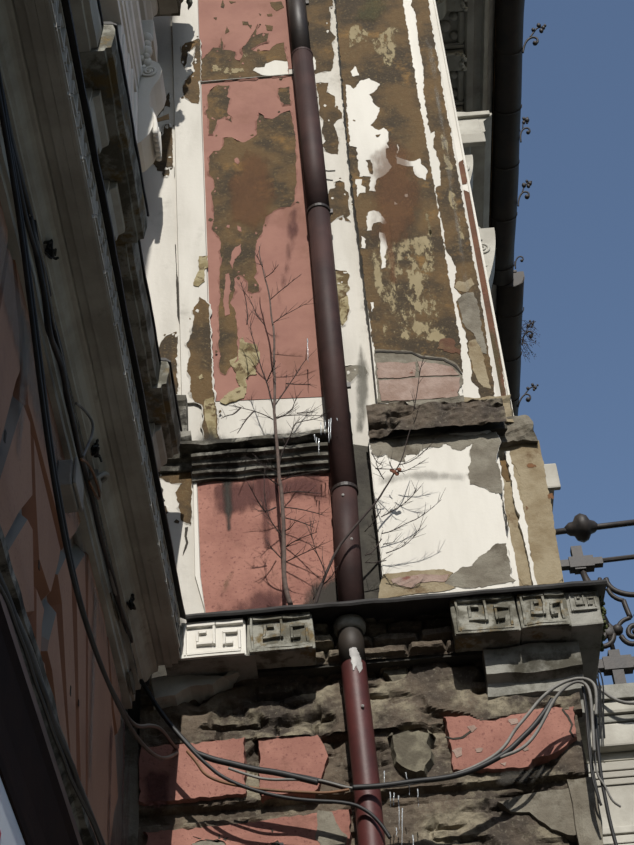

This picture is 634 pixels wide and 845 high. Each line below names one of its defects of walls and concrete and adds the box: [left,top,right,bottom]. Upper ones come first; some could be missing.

peeling [152,92,175,178]
peeling [159,1,299,439]
peeling [305,0,506,403]
peeling [368,431,563,598]
peeling [349,647,363,673]